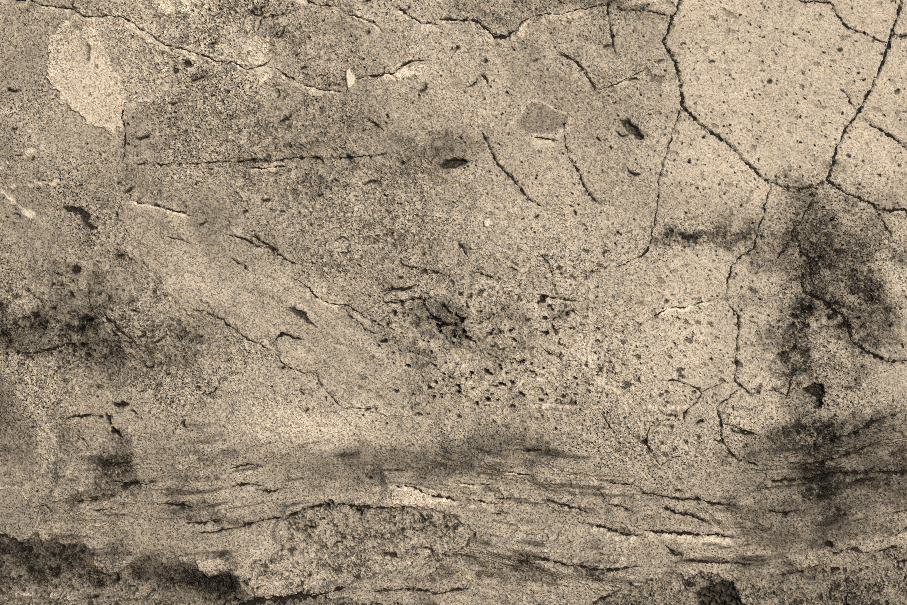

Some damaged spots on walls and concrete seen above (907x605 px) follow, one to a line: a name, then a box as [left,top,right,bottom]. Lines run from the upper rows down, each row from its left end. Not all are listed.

crack [16,0,426,123]
crack [121,105,389,170]
crack [133,200,191,216]
crack [396,0,907,465]
crack [229,234,375,334]
crack [380,269,459,326]
flaking render [0,400,907,605]